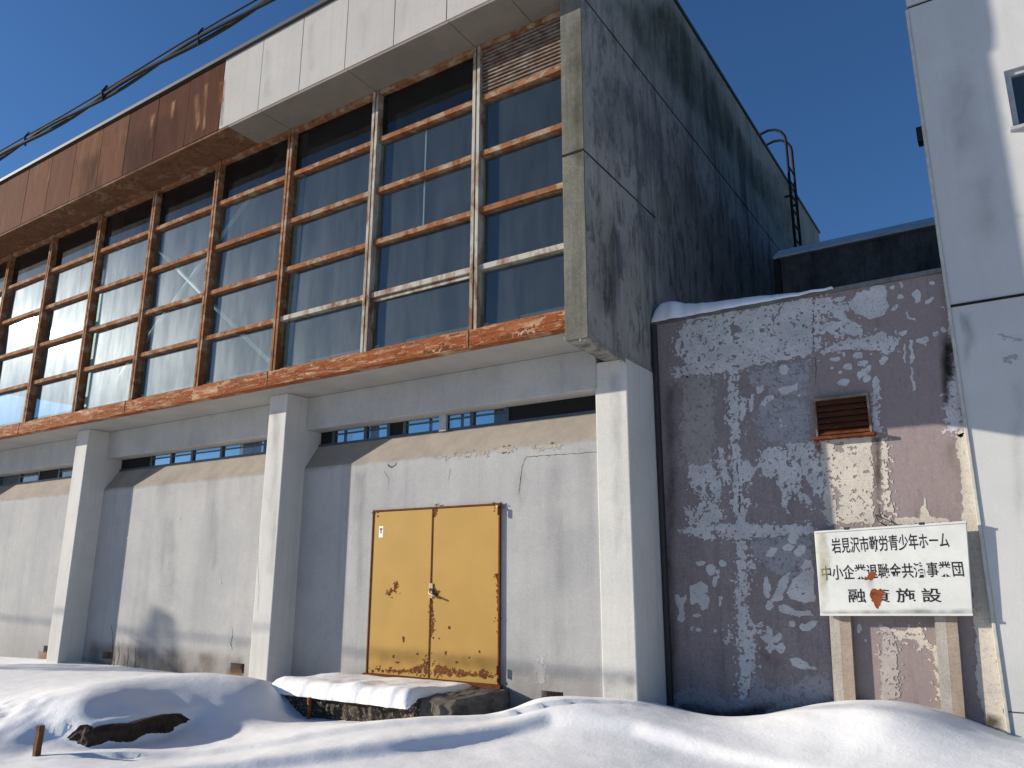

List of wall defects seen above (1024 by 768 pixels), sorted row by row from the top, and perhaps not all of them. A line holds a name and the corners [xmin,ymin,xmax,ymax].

leakage [652,8,741,151]
corrosion [216,311,565,395]
peeling [669,281,1007,733]
corrosion [428,586,450,639]
corrosion [369,650,496,679]